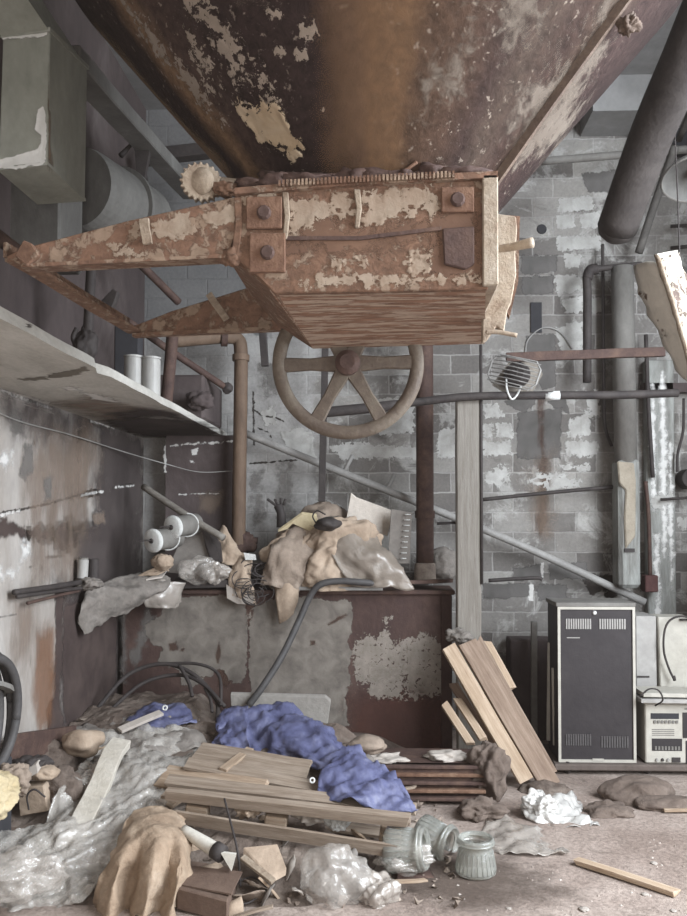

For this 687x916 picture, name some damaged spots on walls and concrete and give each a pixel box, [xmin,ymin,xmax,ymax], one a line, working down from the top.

water stain [0,390,222,729]
corrosion [537,457,548,534]
peeling [122,594,441,727]
corrosion [354,690,441,748]